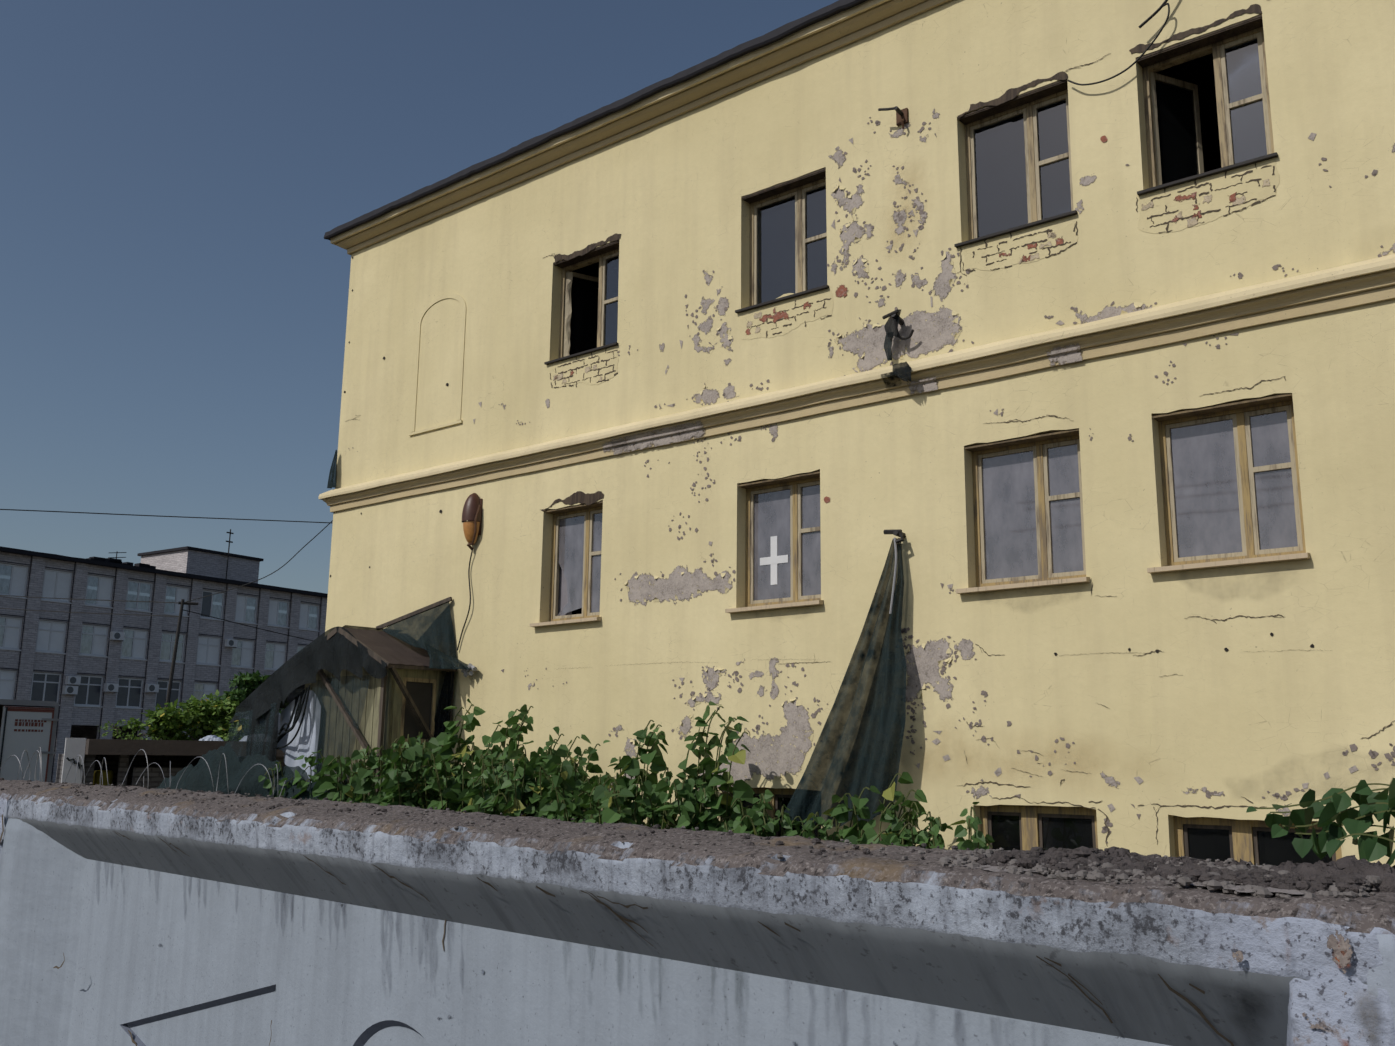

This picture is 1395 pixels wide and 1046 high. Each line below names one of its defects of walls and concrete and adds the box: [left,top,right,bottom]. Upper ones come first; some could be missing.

peeling [867,109,940,142]
spalling [1136,160,1280,234]
peeling [659,138,1097,376]
spalling [545,345,638,408]
crack [1203,376,1286,395]
peeling [760,423,778,442]
peeling [602,379,769,607]
crack [1185,614,1283,623]
peeling [603,725,638,790]
peeling [671,657,828,793]
peeling [901,627,993,769]
peeling [966,767,1002,799]